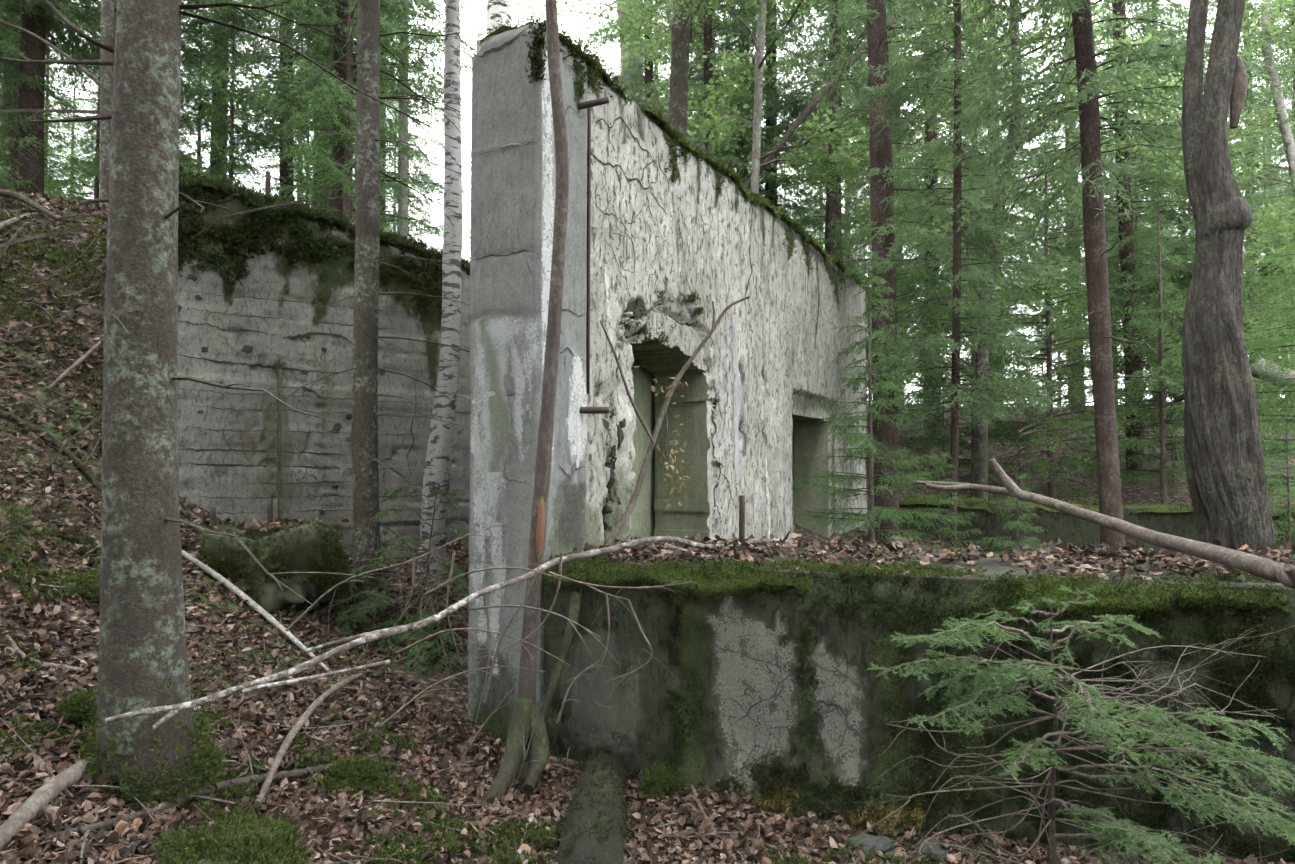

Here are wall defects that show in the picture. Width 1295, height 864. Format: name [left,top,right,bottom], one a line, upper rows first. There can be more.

leakage [211,252,237,307]
leakage [276,244,295,295]
leakage [311,276,333,325]
crack [473,250,537,260]
crack [549,103,806,369]
crack [559,347,619,377]
crack [559,418,618,531]
leakage [669,596,713,790]
leakage [797,619,819,757]